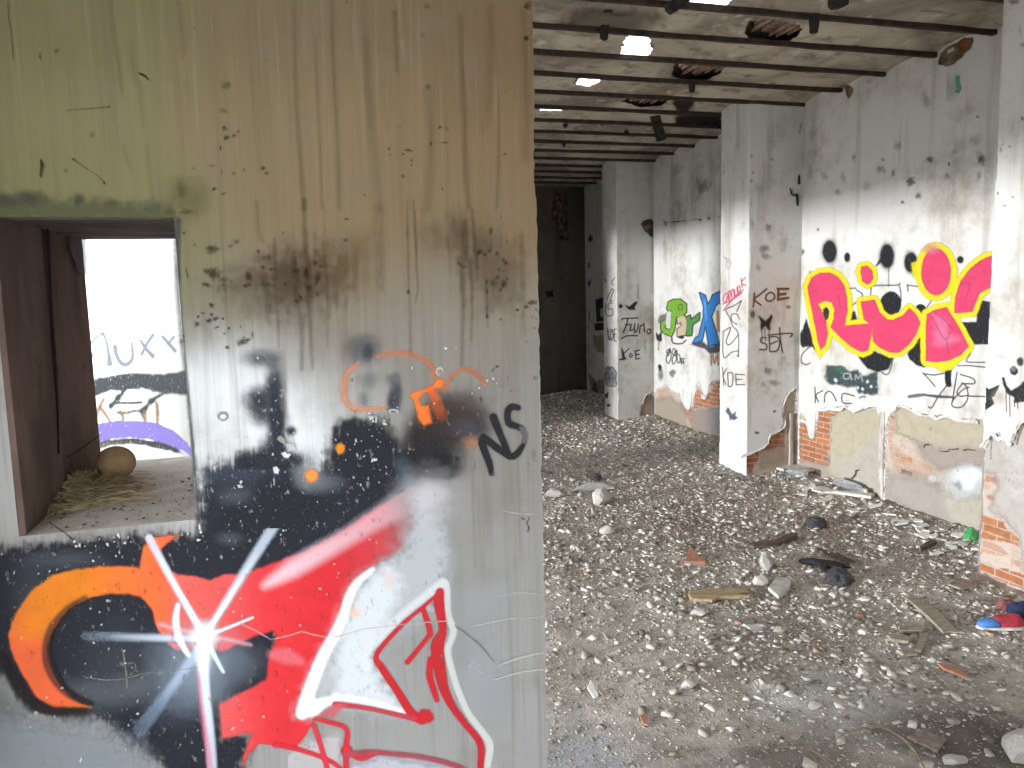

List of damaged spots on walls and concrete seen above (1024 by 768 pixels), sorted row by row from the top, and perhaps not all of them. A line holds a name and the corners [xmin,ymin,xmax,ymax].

spalling [744,19,802,37]
spalling [673,64,726,76]
leakage [244,250,349,302]
leakage [0,192,199,525]
spalling [640,377,720,437]
spalling [741,385,1024,592]